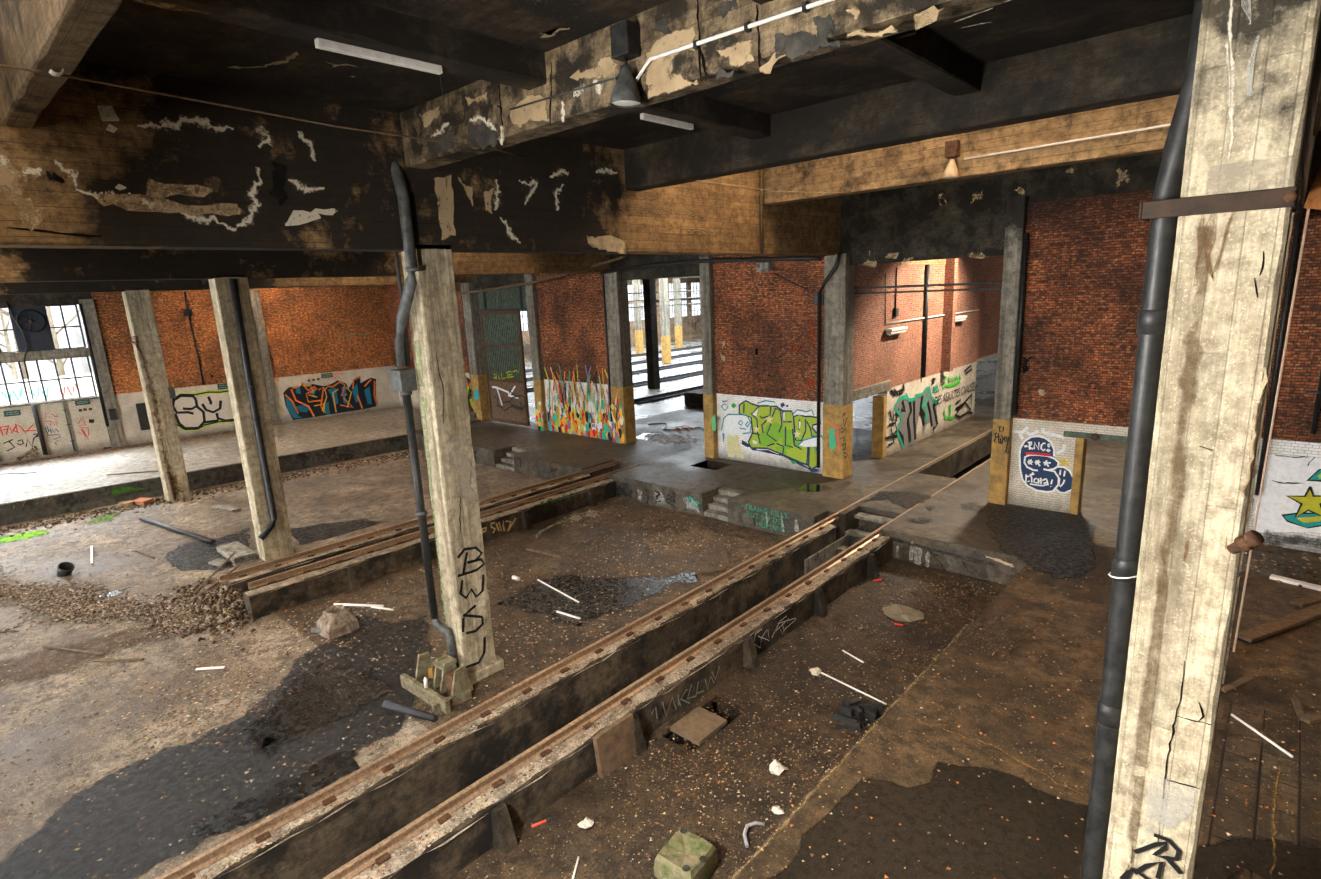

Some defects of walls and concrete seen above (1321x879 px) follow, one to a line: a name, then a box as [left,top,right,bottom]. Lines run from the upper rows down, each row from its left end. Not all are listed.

spalling [419,106,497,159]
peeling [465,92,487,106]
peeling [510,94,549,129]
peeling [570,56,617,81]
peeling [645,16,699,98]
spalling [716,7,897,80]
peeling [914,6,939,28]
peeling [99,179,241,216]
peeling [269,162,337,226]
peeling [434,175,494,240]
water stain [0,616,431,879]
crack [1158,661,1211,841]